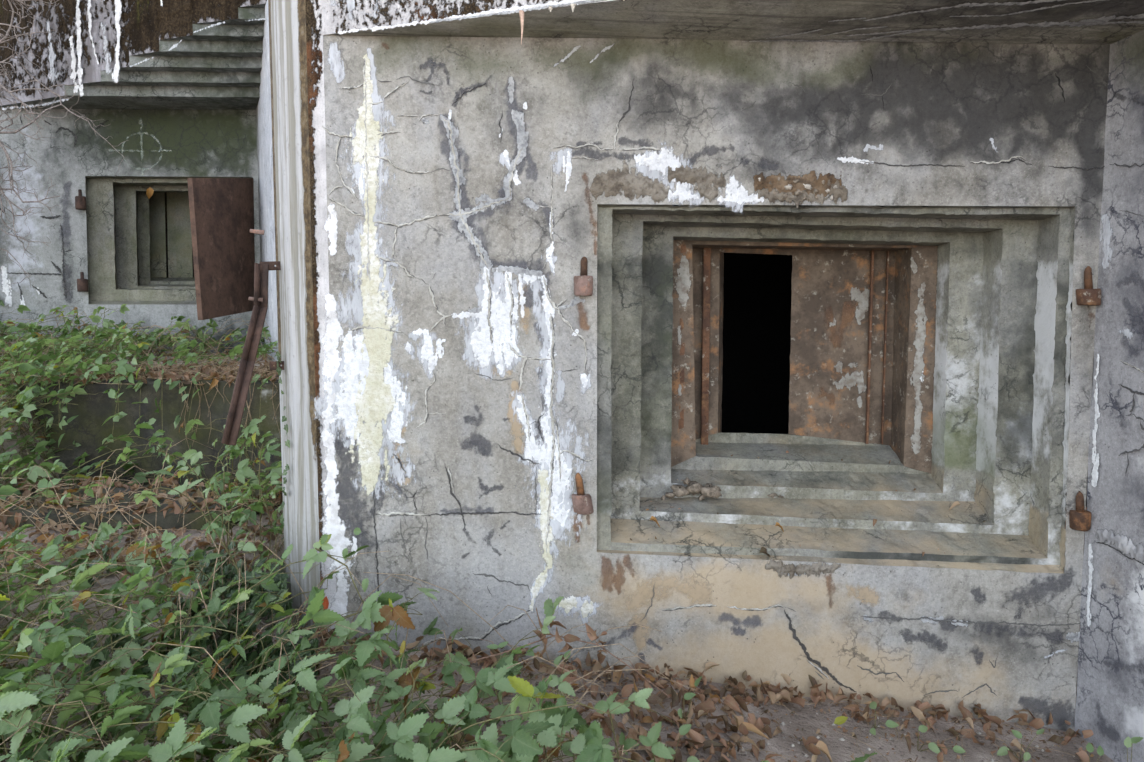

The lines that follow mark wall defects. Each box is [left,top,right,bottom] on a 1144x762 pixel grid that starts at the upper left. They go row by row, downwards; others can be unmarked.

leakage [47,0,153,96]
crack [614,79,634,149]
spalling [590,156,848,208]
crack [837,138,1144,171]
crack [322,76,591,394]
peeling [436,338,446,358]
crack [1118,360,1144,476]
crack [373,413,592,591]
rust [602,555,633,593]
crack [641,584,998,698]